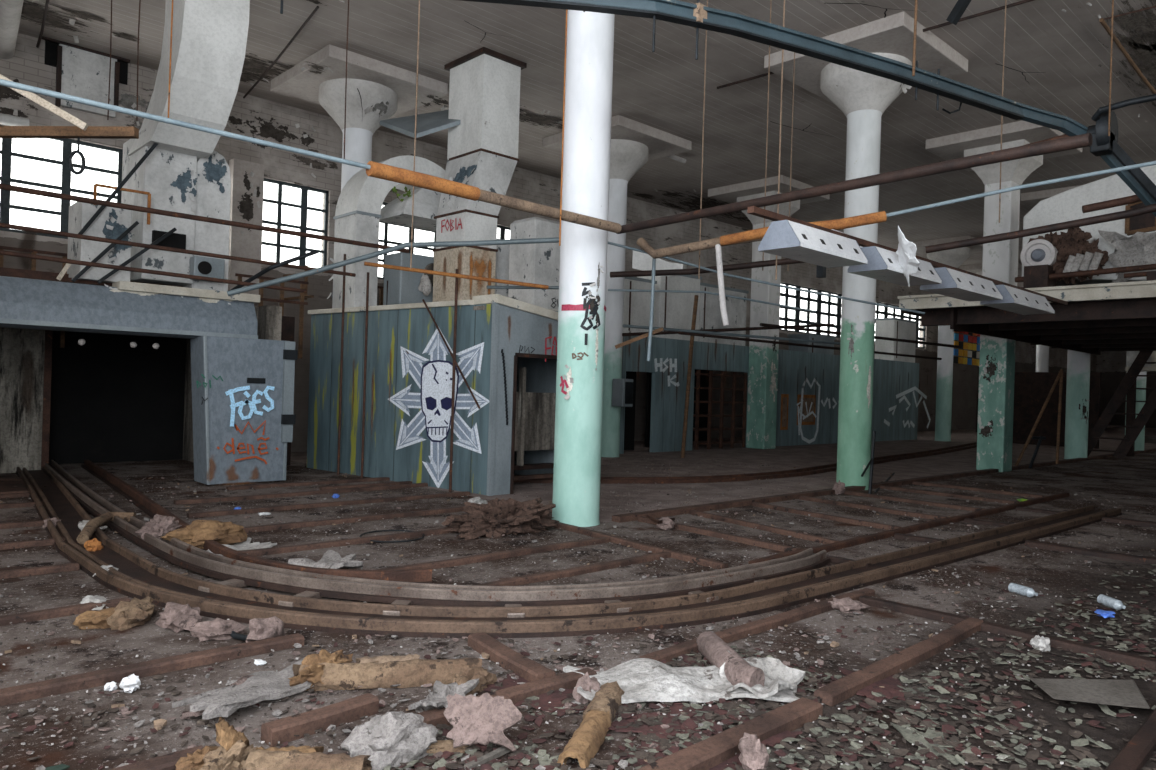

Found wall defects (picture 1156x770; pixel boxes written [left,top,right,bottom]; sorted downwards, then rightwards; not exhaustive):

peeling [1087,0,1156,117]
peeling [0,79,38,118]
peeling [227,112,338,178]